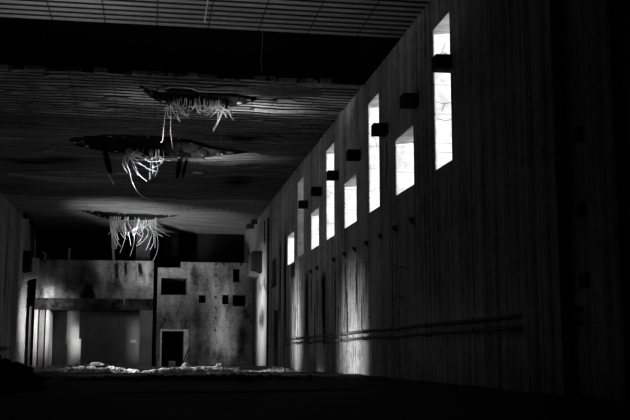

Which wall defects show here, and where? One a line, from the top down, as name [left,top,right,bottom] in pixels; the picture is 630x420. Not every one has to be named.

spalling [69,85,257,202]
spalling [82,210,179,255]
damp [113,263,148,290]